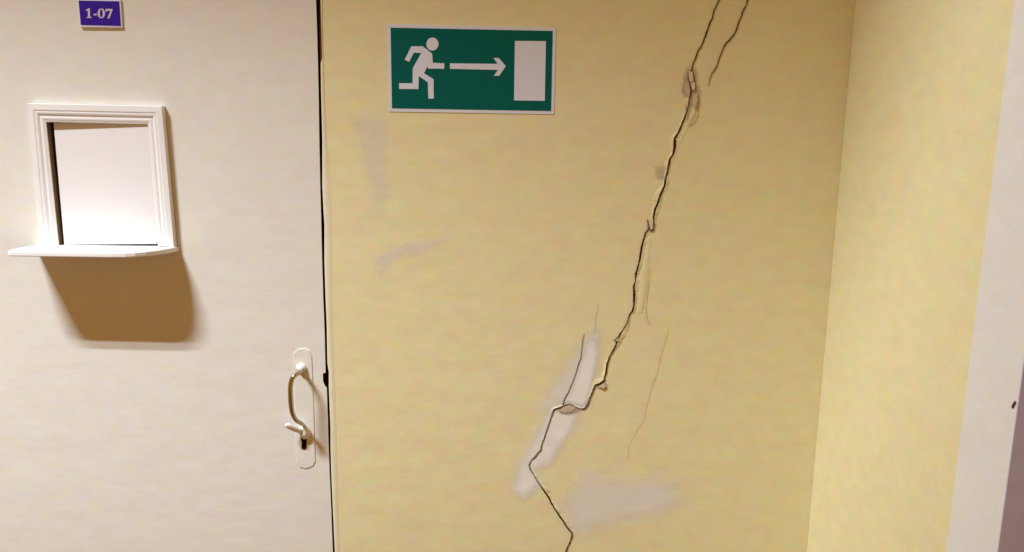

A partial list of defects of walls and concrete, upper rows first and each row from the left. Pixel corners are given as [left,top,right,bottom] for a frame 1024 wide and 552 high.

spalling [683,67,700,119]
crack [528,0,748,552]
spalling [559,404,581,415]